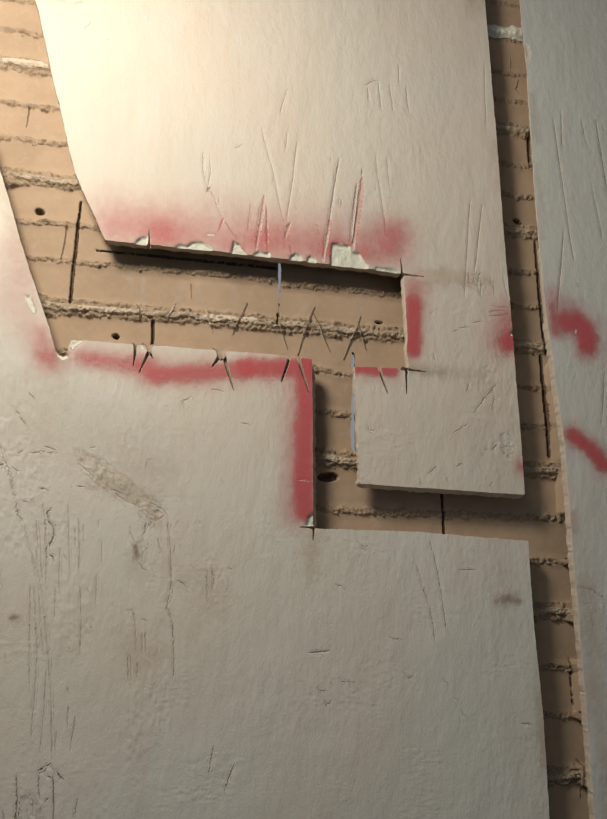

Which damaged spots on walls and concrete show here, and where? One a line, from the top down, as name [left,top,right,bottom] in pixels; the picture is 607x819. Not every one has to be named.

spalling [172,233,215,251]